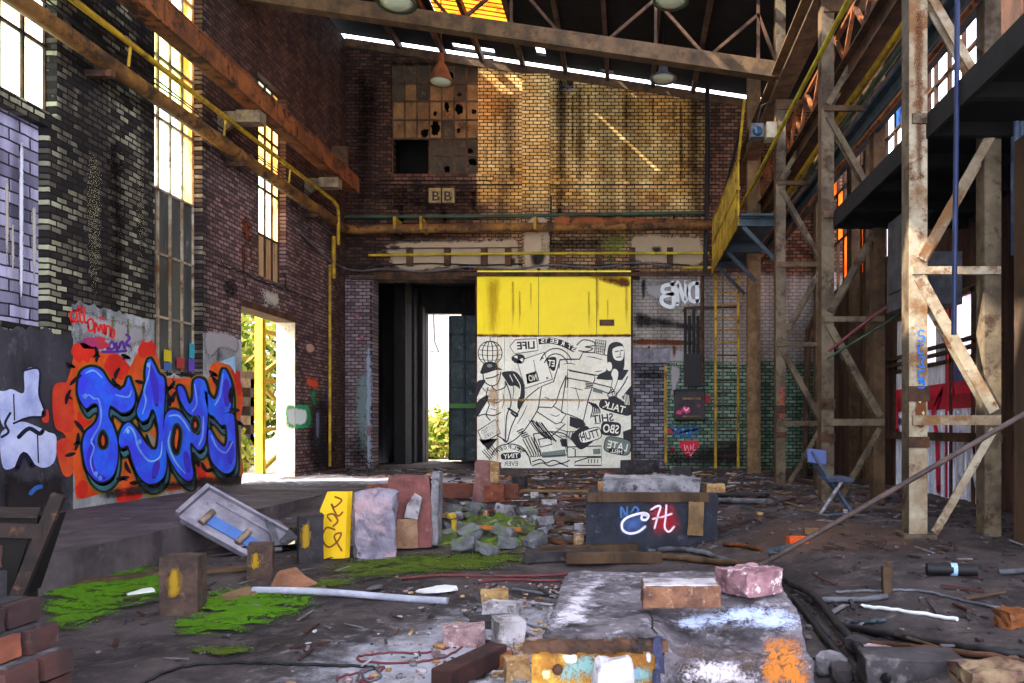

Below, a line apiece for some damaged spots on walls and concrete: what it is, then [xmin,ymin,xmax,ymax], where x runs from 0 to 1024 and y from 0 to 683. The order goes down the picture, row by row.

water stain [556,79,590,213]
water stain [674,99,701,187]
water stain [111,147,121,285]
peeling [386,217,550,270]
peeling [630,234,703,266]